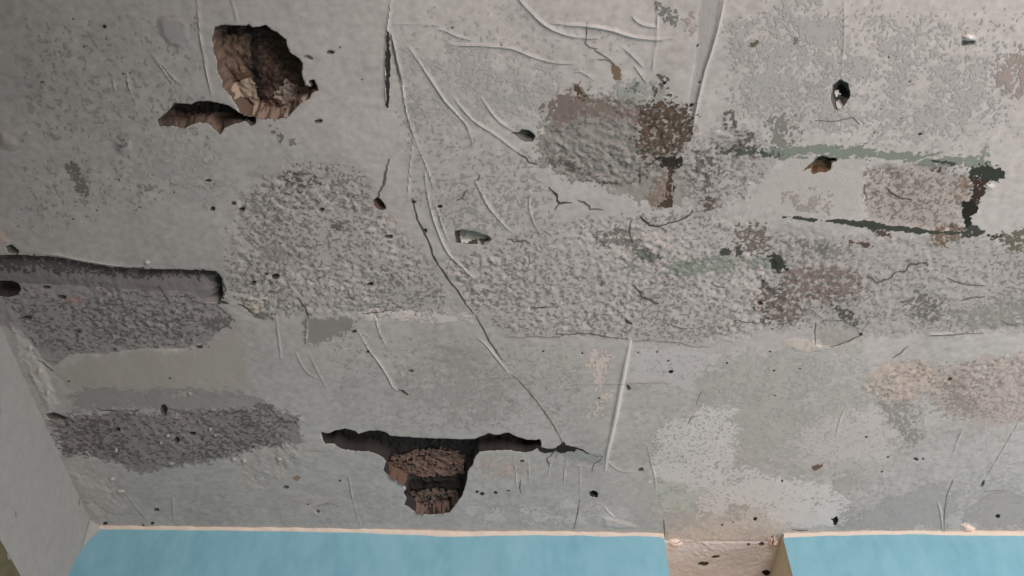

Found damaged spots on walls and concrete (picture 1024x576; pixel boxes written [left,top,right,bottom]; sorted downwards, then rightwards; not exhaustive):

crack [378,158,390,197]
crack [385,31,403,108]
flaking render [0,0,1024,413]
corrosion [538,81,701,208]
water stain [394,0,1005,211]
water stain [781,186,1024,253]
spalling [321,428,541,516]